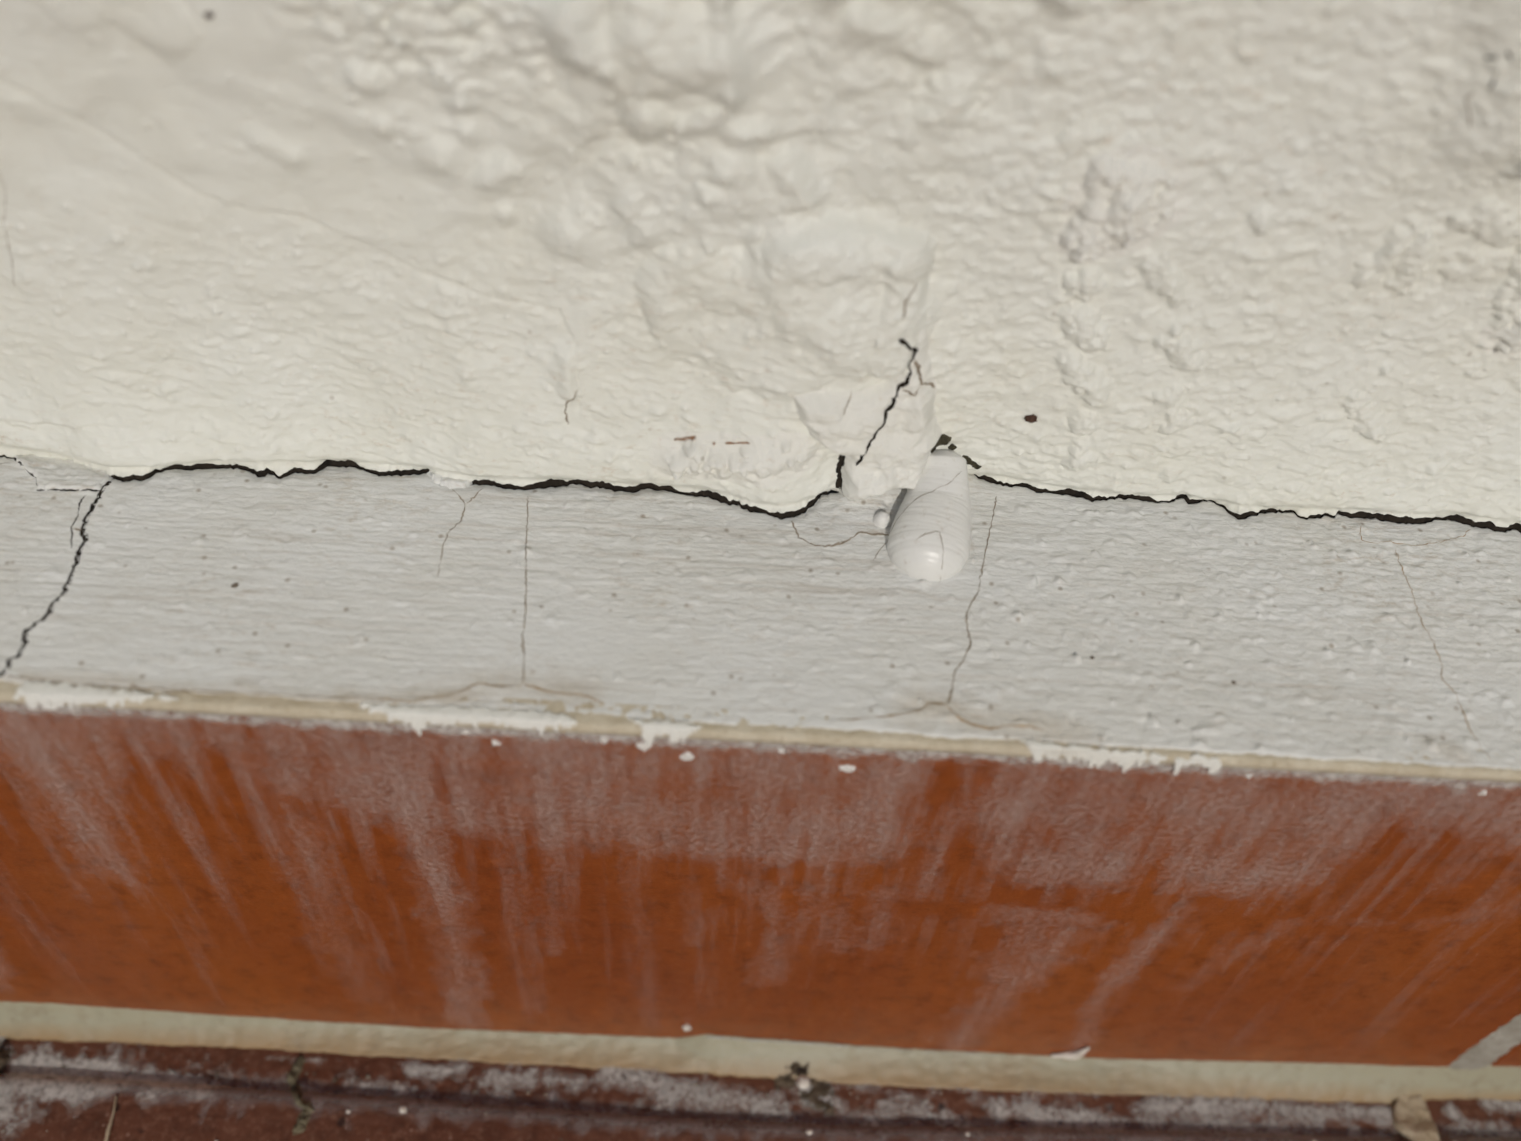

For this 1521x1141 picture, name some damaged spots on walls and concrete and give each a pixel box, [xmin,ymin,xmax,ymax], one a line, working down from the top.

efflorescence [0,703,1517,788]
crack [0,281,1521,760]